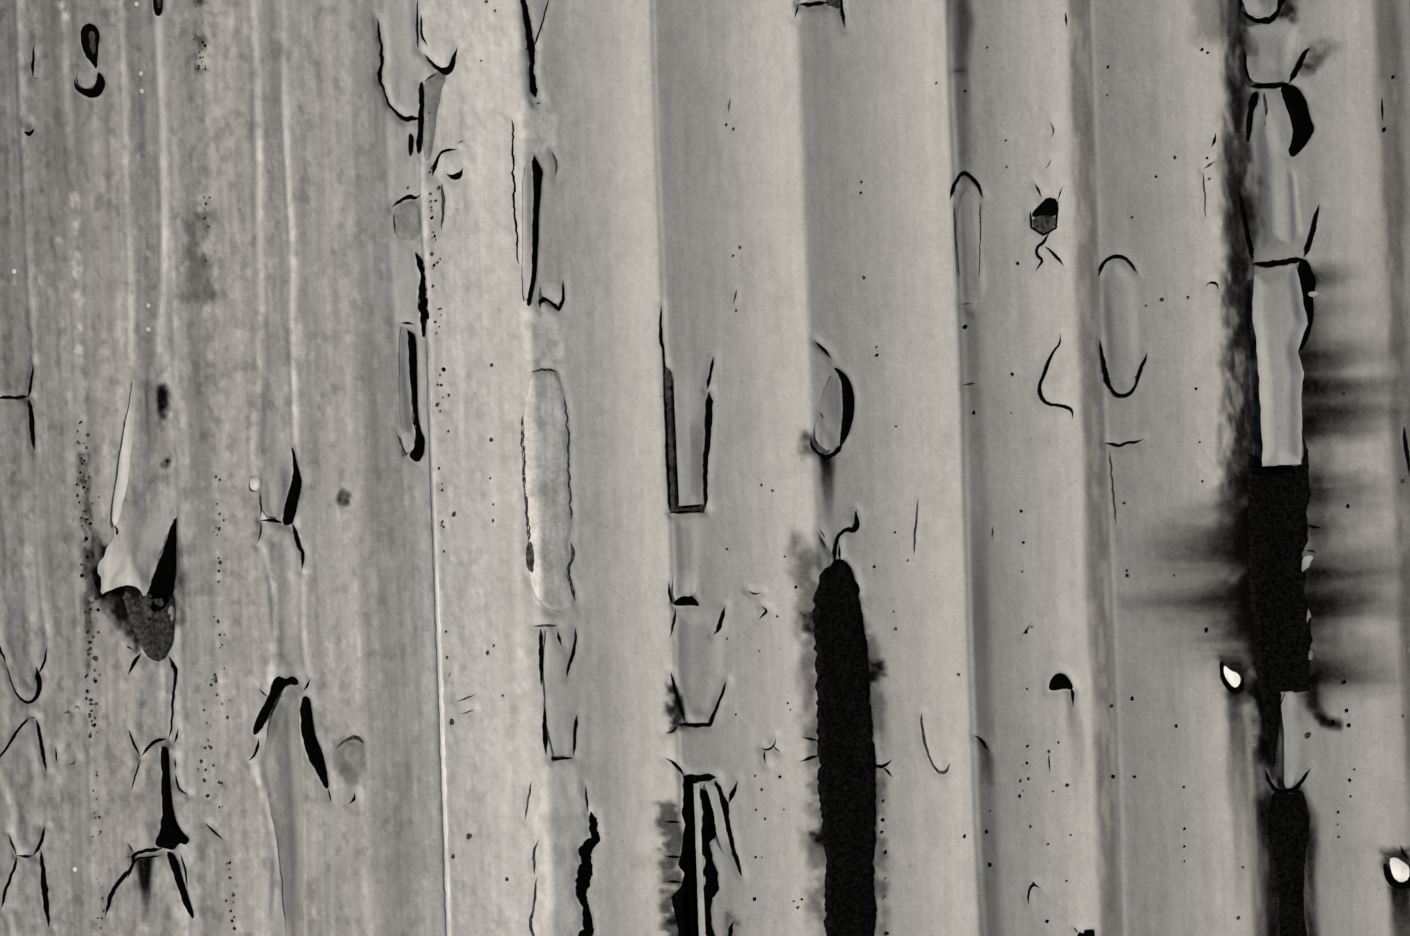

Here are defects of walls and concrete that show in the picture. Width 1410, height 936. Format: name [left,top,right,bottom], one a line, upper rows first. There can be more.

peeling [1239,0,1320,196]
peeling [76,380,194,929]
peeling [250,447,305,570]
peeling [392,71,446,462]
spalling [517,99,600,936]
peeling [659,305,714,514]
peeling [693,783,731,936]
peeling [803,340,854,486]
corrosion [800,509,893,936]
corrosion [1186,348,1363,936]
peeling [1239,192,1320,466]
corrosion [1308,272,1325,297]